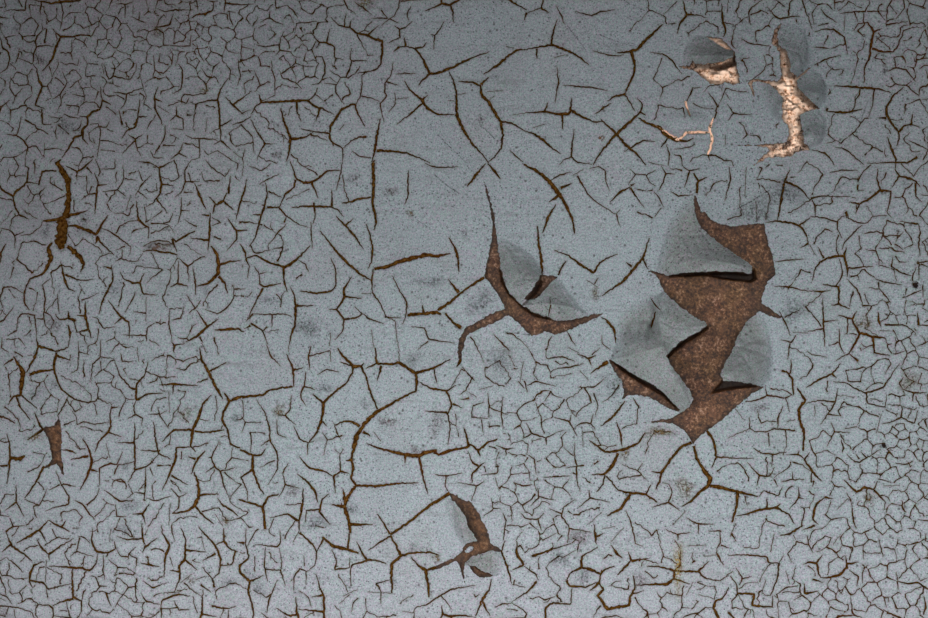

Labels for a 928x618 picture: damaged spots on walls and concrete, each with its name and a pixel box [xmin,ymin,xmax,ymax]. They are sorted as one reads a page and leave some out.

peeling [681,21,828,165]
crack [0,0,589,618]
peeling [458,182,602,359]
peeling [609,194,781,444]
peeling [432,493,505,582]